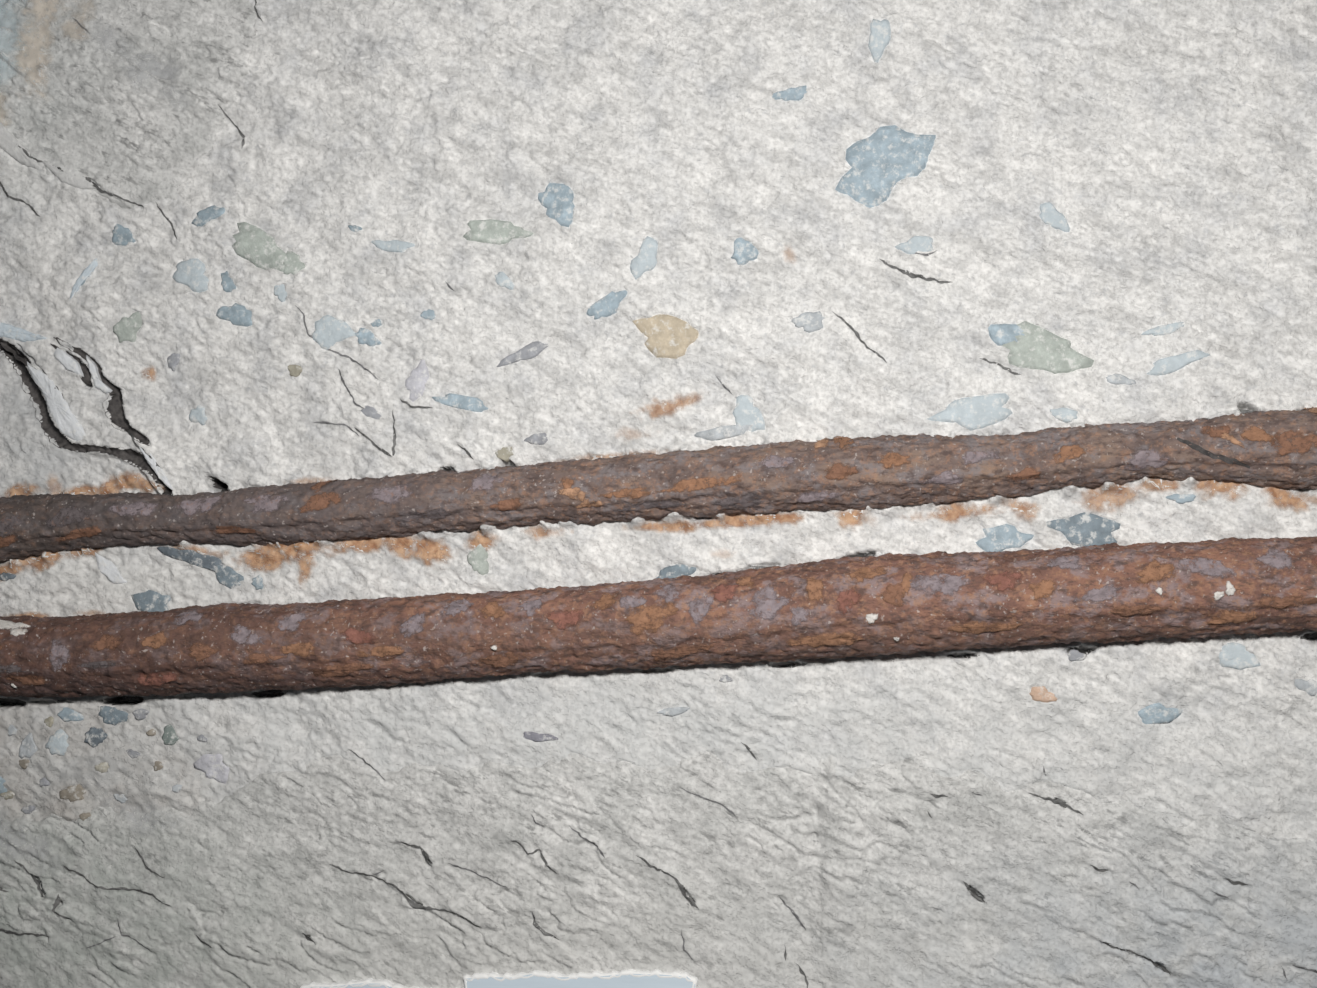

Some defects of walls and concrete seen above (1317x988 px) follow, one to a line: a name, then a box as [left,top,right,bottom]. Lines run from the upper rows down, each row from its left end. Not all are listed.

spalling [0,0,1317,497]
crack [0,337,173,496]
corrosion [62,474,157,495]
corrosion [242,536,449,578]
spalling [0,477,1317,617]
corrosion [641,513,802,532]
corrosion [1197,479,1242,499]
spalling [0,629,1317,841]
crack [0,848,170,950]
crack [329,864,482,928]
crack [637,856,699,959]
peeling [463,969,698,988]